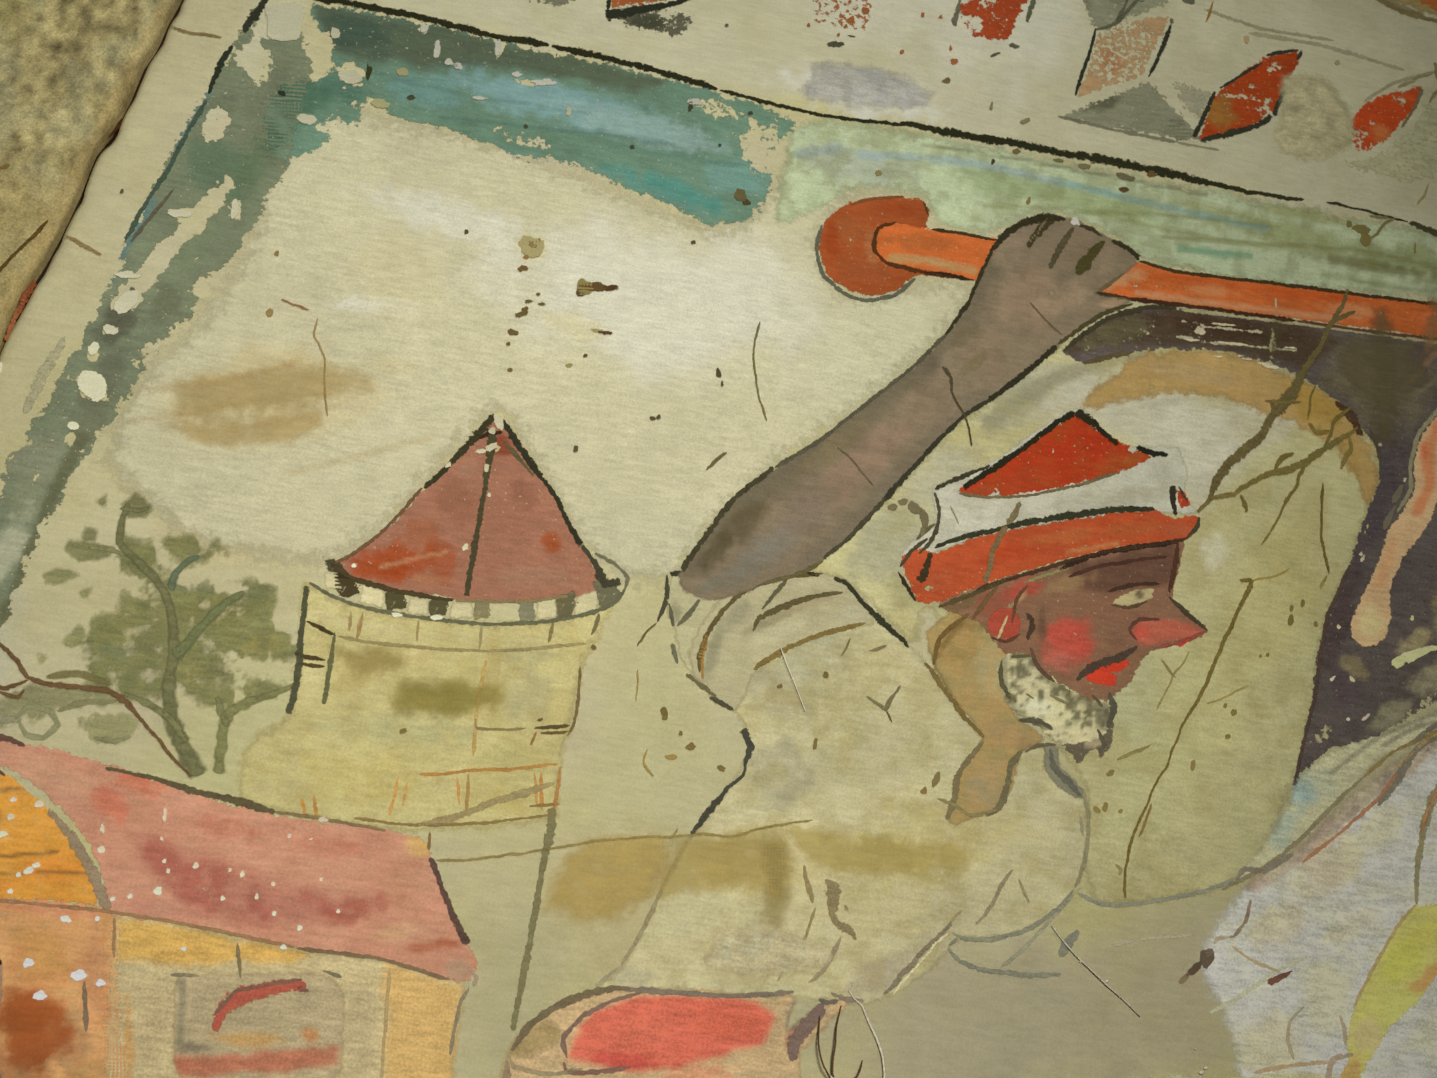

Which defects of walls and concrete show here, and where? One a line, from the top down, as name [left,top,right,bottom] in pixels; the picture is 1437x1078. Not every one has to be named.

peeling [265,2,306,41]
peeling [421,24,462,69]
peeling [338,64,372,85]
peeling [512,71,558,86]
peeling [687,98,704,112]
peeling [296,113,317,125]
peeling [168,209,192,218]
peeling [231,199,239,219]
peeling [77,270,141,402]